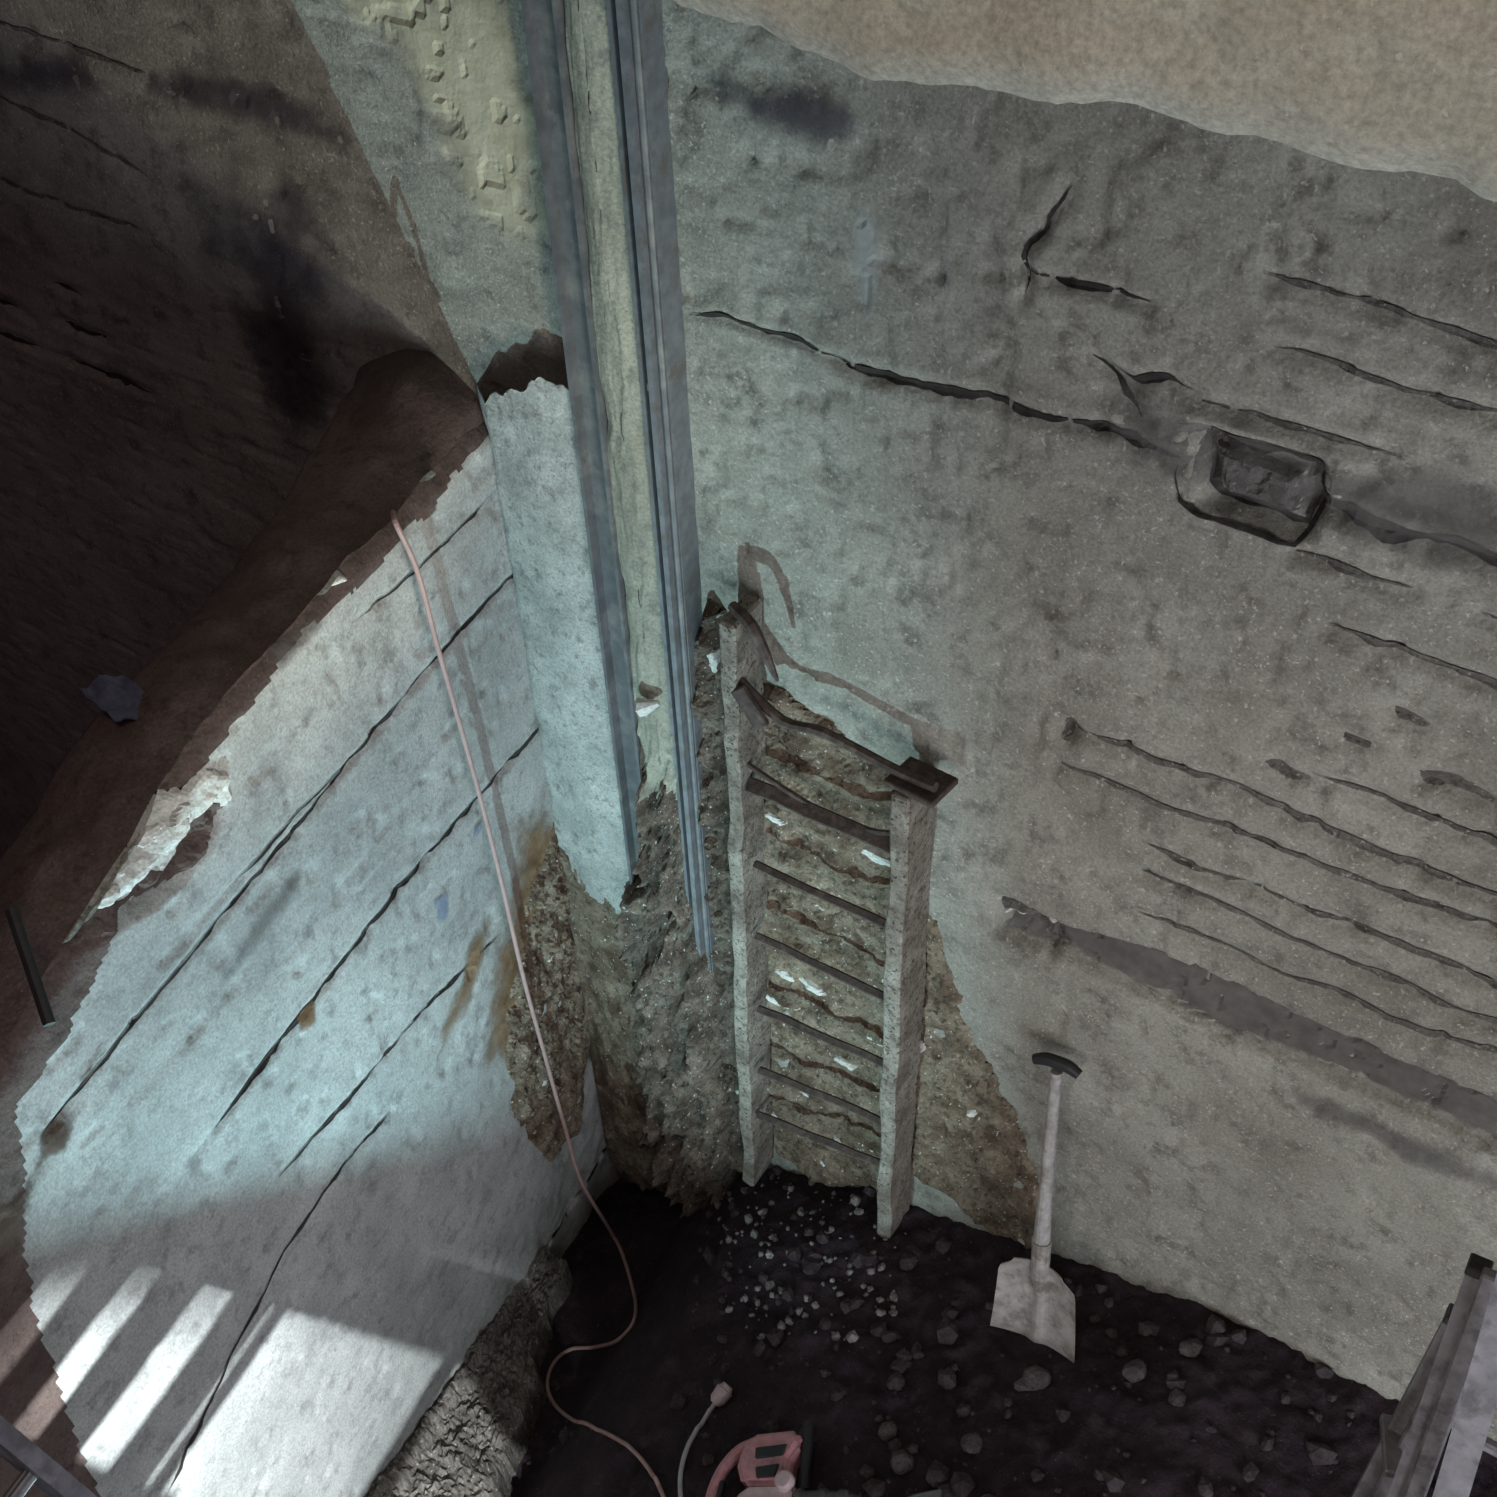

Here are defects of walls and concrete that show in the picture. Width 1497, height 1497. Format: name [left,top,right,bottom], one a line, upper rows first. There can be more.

leakage [152,75,335,138]
leakage [233,187,325,421]
crack [1021,185,1150,302]
crack [689,312,1497,567]
spalling [62,768,233,946]
crack [41,575,539,1138]
spalling [505,823,591,1162]
spalling [691,598,744,1172]
spalling [762,682,895,1187]
spalling [911,913,1052,1249]
leakage [1314,1101,1456,1170]